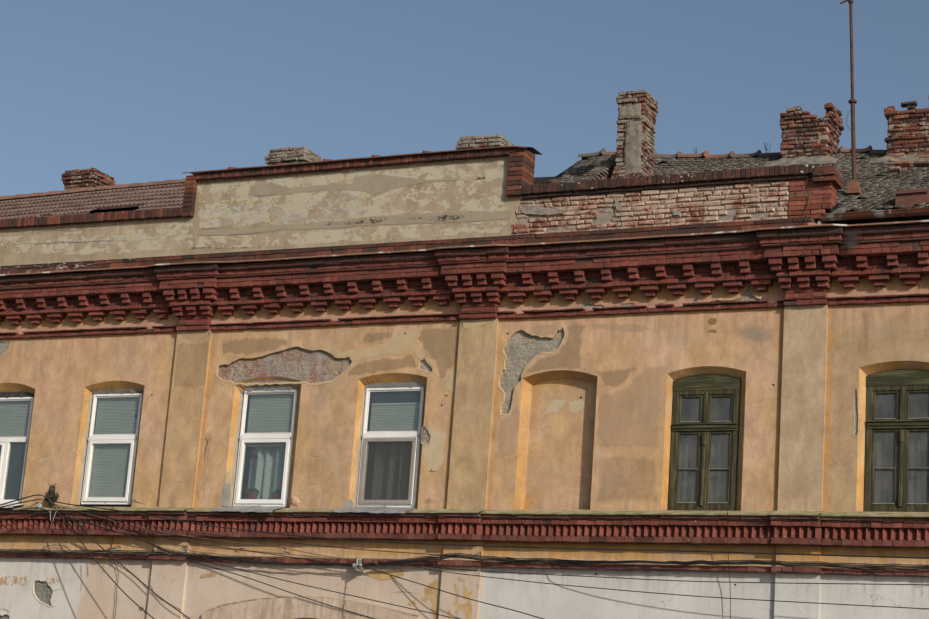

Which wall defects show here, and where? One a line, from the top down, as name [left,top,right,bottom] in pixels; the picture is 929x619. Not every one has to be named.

flaking render [0,161,789,274]
flaking render [0,340,10,357]
flaking render [215,328,436,386]
flaking render [498,327,565,416]
peeling [544,396,584,415]
flaking render [0,576,60,608]